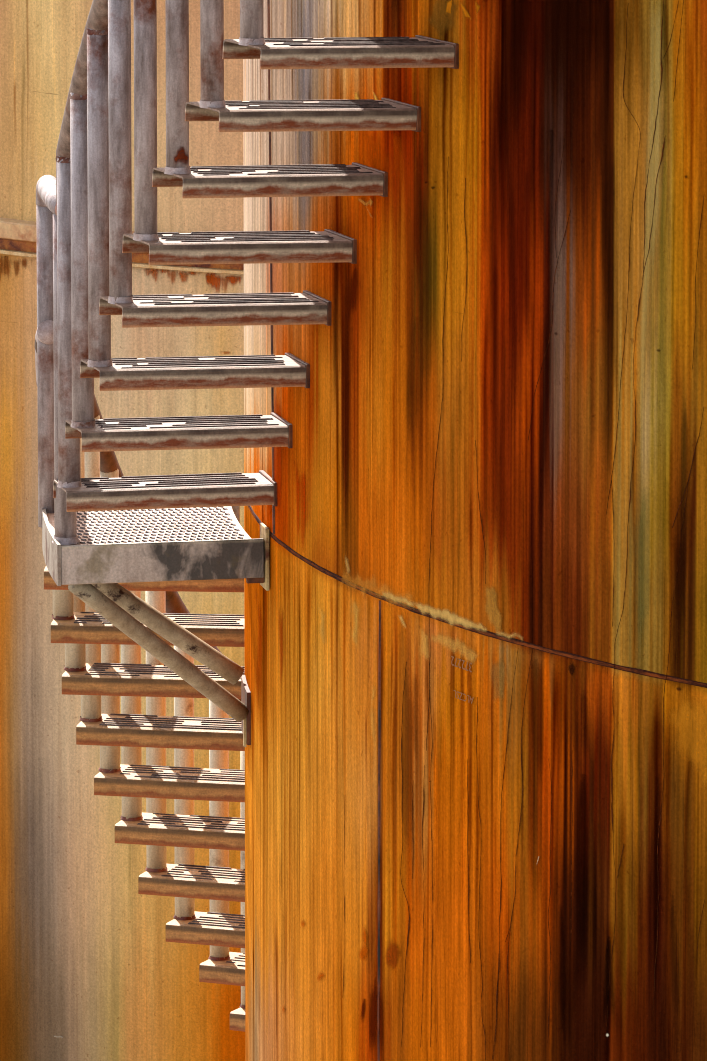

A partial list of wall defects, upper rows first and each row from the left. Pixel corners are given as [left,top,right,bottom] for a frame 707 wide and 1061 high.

corrosion [0,256,26,275]
crack [692,197,704,368]
crack [606,0,684,1038]
crack [467,650,533,1060]
crack [548,766,573,1037]